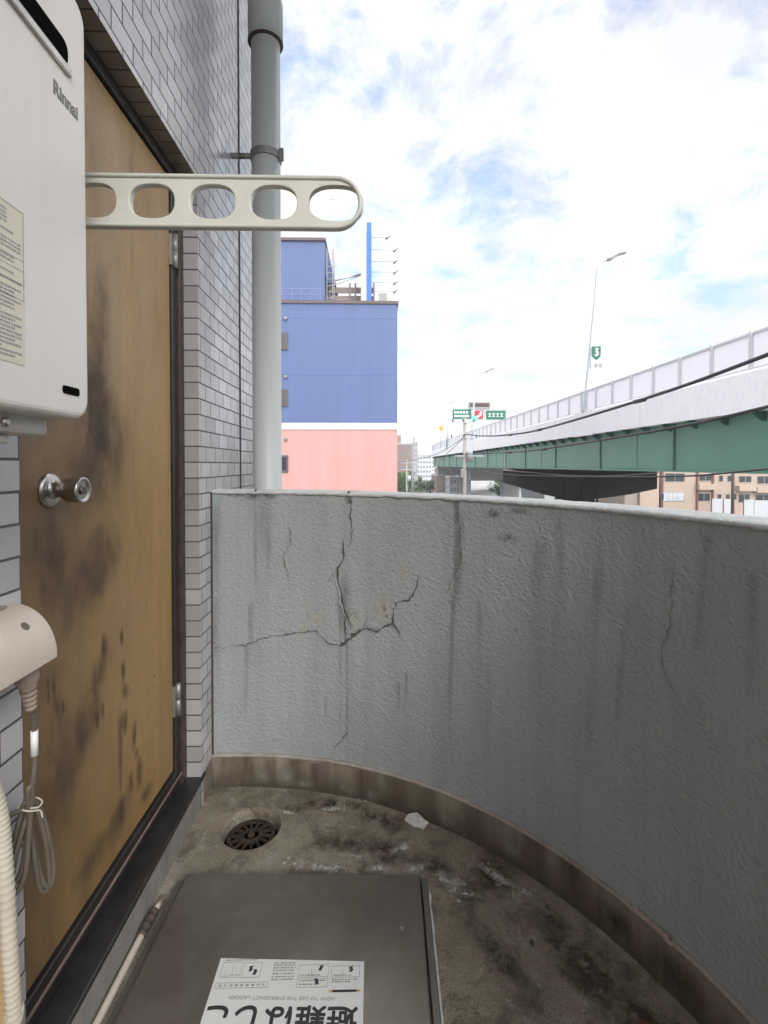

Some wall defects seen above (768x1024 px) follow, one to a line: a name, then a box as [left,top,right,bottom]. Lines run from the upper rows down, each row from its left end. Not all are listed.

crack [220,490,419,649]
crack [661,566,687,712]
leakage [439,868,510,900]